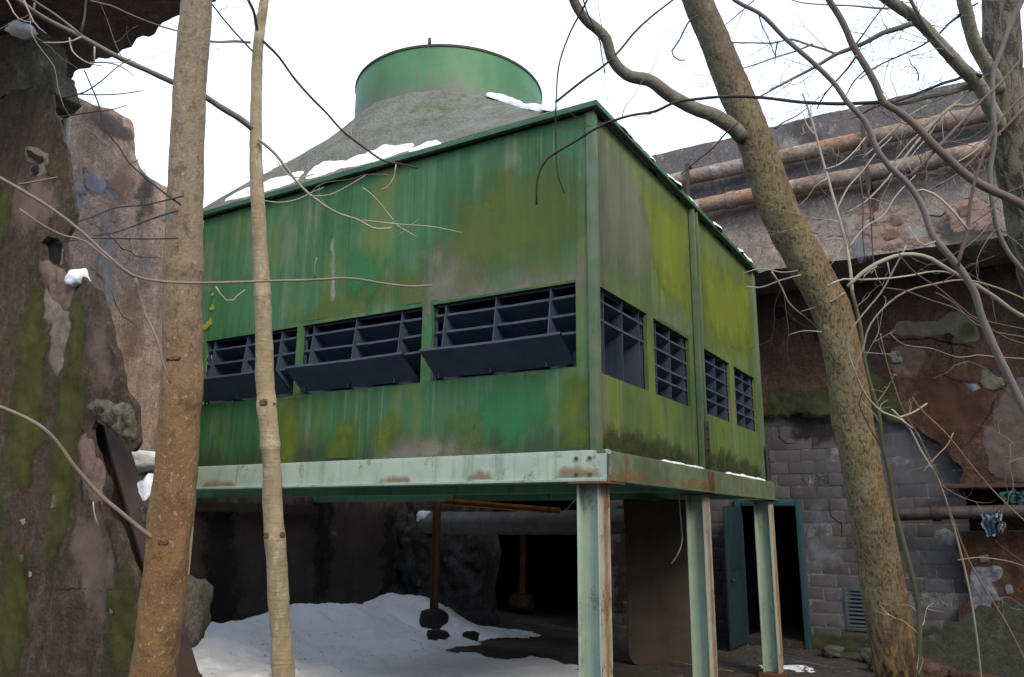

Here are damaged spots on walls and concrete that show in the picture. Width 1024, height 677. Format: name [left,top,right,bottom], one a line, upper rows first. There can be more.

spalling [843,205,936,256]
spalling [945,198,997,232]
peeling [980,370,1005,390]
rust [560,469,596,478]
peeling [886,432,949,489]